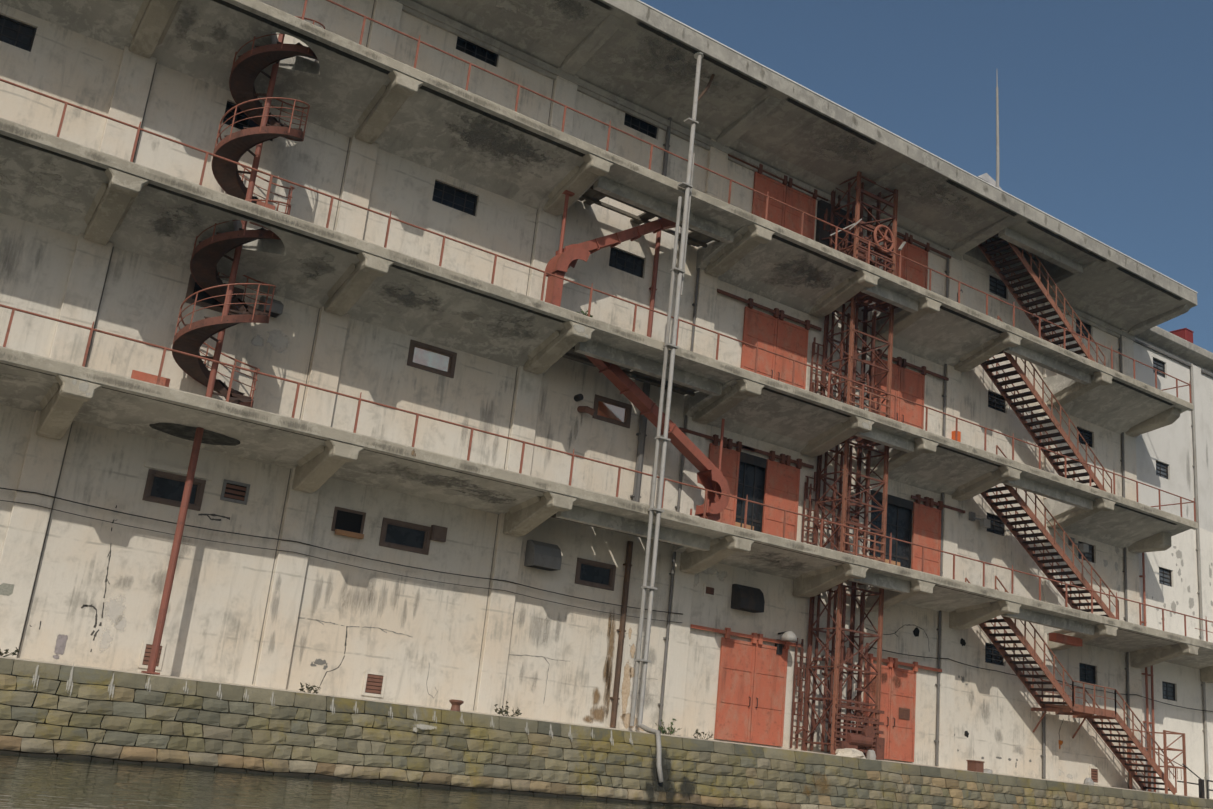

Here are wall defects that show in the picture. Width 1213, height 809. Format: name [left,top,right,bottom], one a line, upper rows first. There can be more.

crack [81,505,117,652]